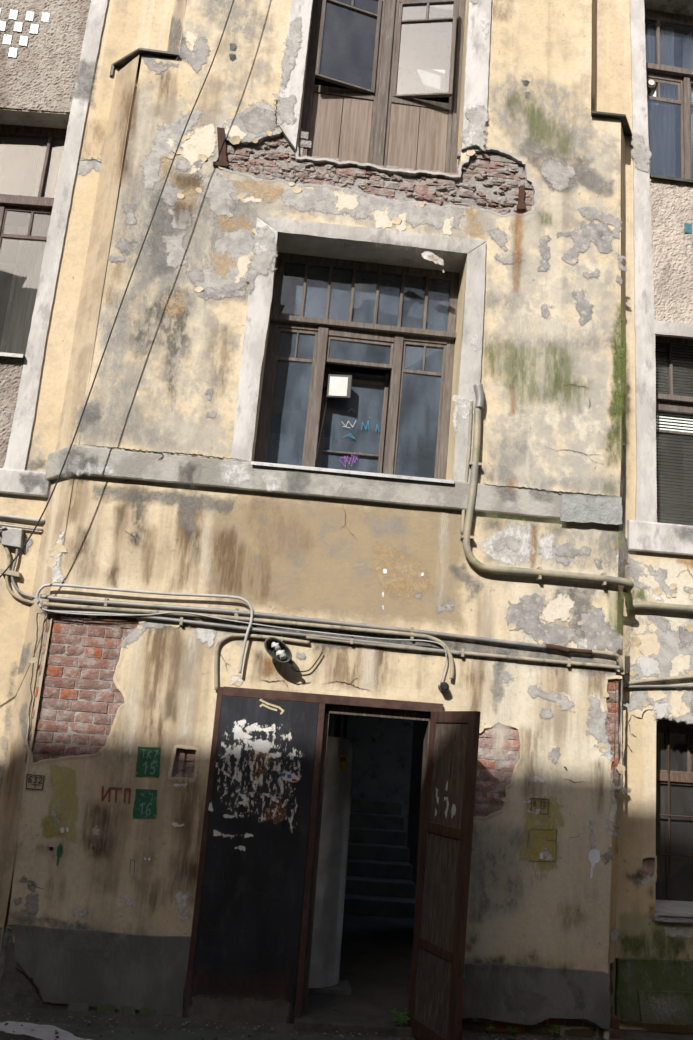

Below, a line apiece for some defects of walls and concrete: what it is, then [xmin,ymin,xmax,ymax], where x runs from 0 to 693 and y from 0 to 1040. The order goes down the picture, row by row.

flaking render [108,17,538,300]
peeling [537,206,628,326]
leakage [20,460,48,492]
leakage [60,451,234,544]
leakage [220,464,309,492]
flaking render [505,440,693,799]
flaking render [25,609,216,766]
flaking render [474,719,524,821]